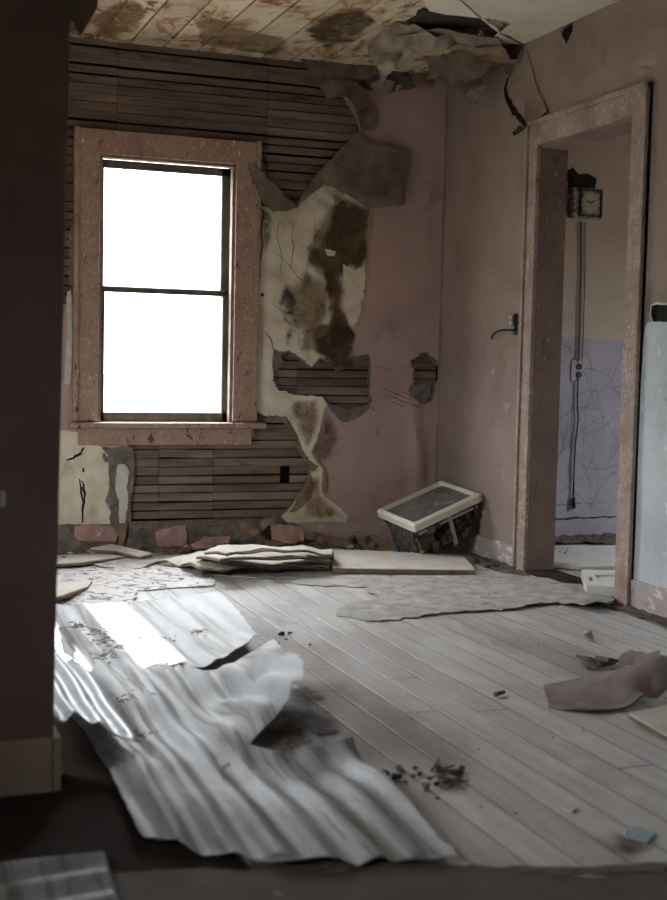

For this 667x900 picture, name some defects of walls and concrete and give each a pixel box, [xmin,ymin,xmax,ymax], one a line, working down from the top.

damp [95,3,147,37]
damp [196,21,285,55]
damp [306,11,374,47]
peeling [503,48,547,135]
flaking render [55,0,438,553]
damp [279,199,367,367]